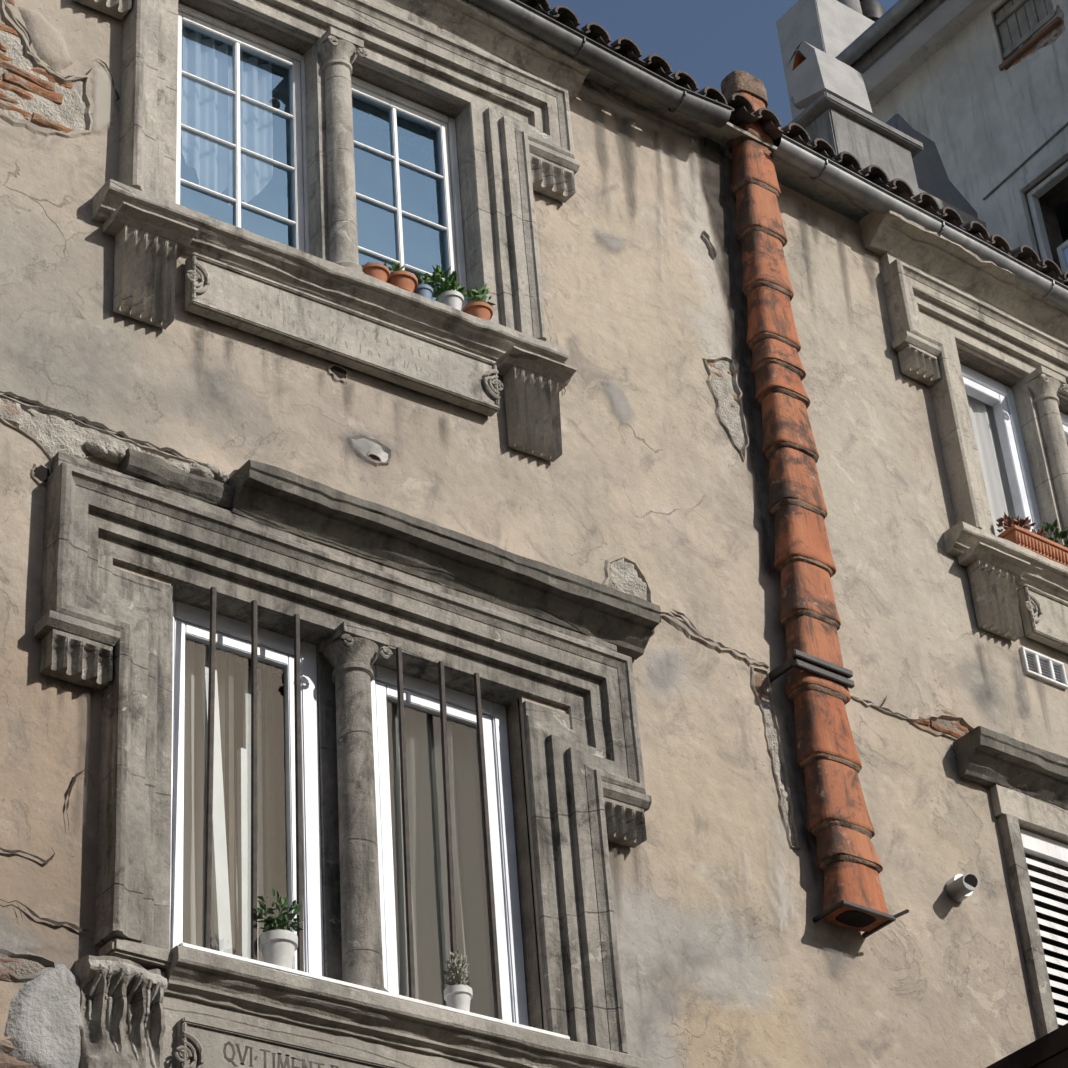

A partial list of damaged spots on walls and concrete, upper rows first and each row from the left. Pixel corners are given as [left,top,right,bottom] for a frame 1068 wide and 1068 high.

flaking render [0,0,95,138]
peeling [0,394,204,486]
flaking render [702,355,750,462]
flaking render [602,553,654,603]
crack [851,695,913,721]
crack [0,770,94,864]
crack [0,899,88,932]